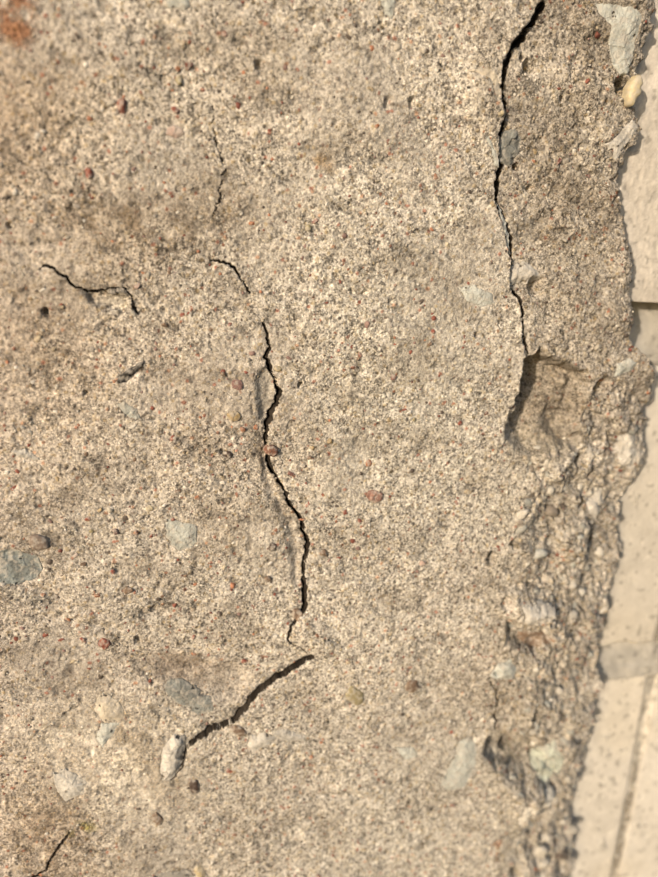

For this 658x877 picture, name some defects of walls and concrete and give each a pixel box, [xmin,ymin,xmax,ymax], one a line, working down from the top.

crack [39,265,139,315]
crack [209,259,251,294]
crack [494,0,545,354]
crack [172,322,315,779]
spalling [479,348,621,877]
crack [31,831,70,877]